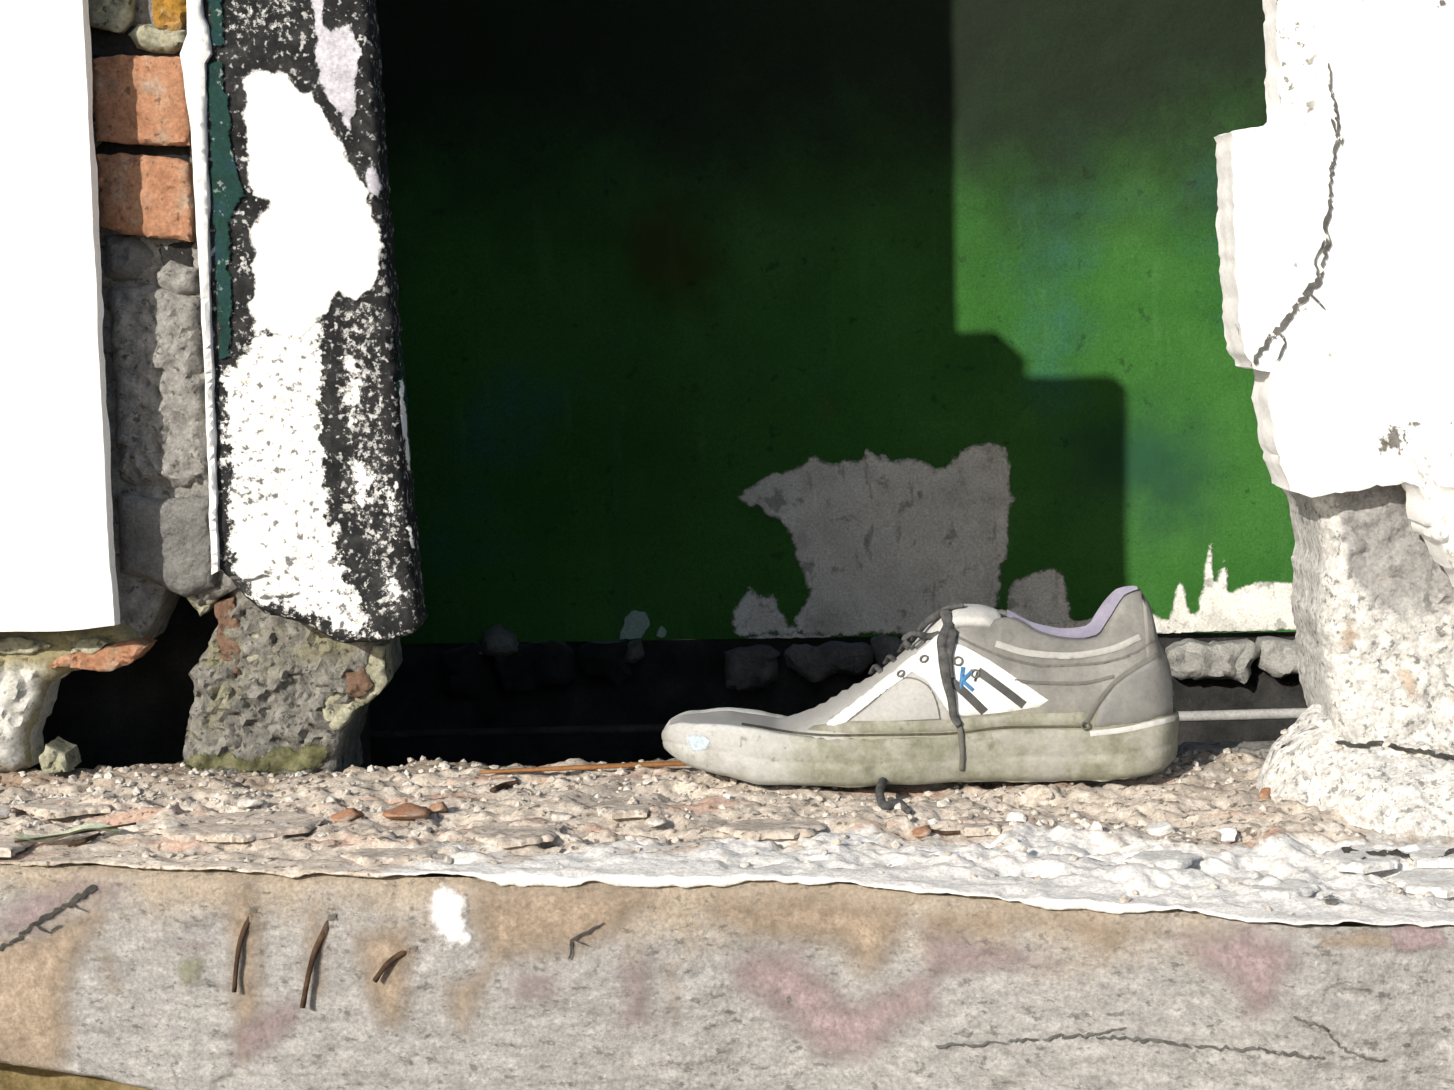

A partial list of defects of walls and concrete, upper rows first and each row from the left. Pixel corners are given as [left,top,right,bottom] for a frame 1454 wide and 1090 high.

peeling [186,0,415,731]